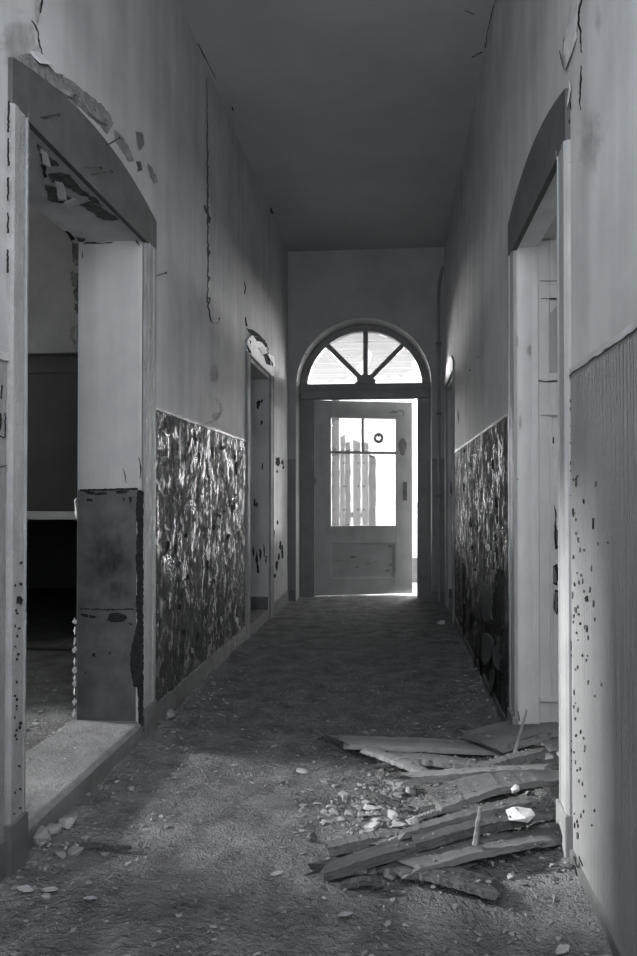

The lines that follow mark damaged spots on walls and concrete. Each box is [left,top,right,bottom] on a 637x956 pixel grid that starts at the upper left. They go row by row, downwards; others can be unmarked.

crack [559,0,582,124]
spalling [15,51,158,183]
spalling [37,144,118,221]
crack [198,44,216,303]
peeling [247,329,275,368]
peeling [166,416,176,434]
peeling [164,524,189,587]
peeling [208,497,235,530]
peeling [252,520,284,578]
peeling [450,448,505,705]
peeling [572,565,596,641]
peeling [573,689,586,798]